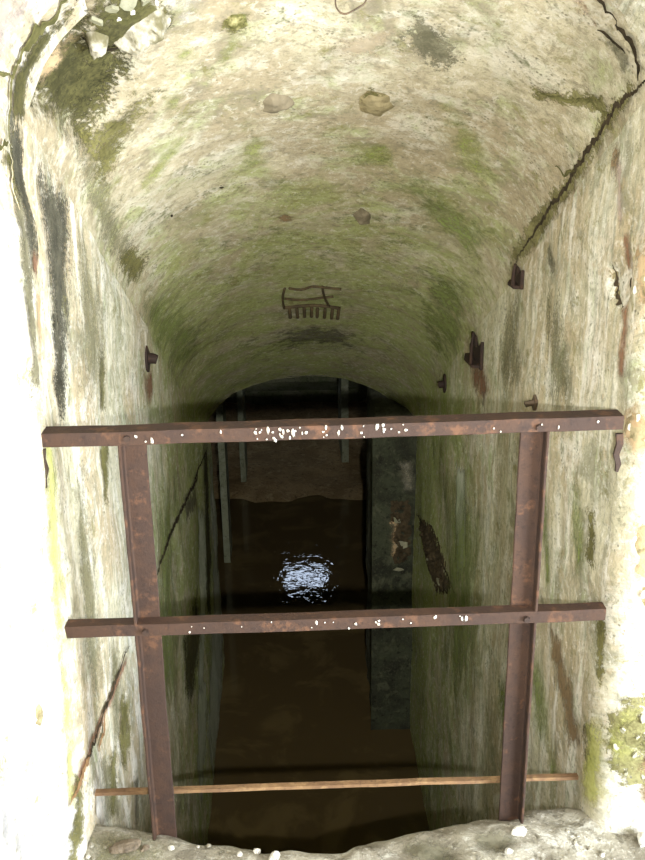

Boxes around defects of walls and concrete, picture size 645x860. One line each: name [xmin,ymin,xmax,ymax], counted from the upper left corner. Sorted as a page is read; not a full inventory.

crack [0,0,77,209]
spalling [76,0,175,60]
crack [515,0,645,264]
leakage [9,103,109,423]
rust [472,368,486,398]
rust [618,307,627,374]